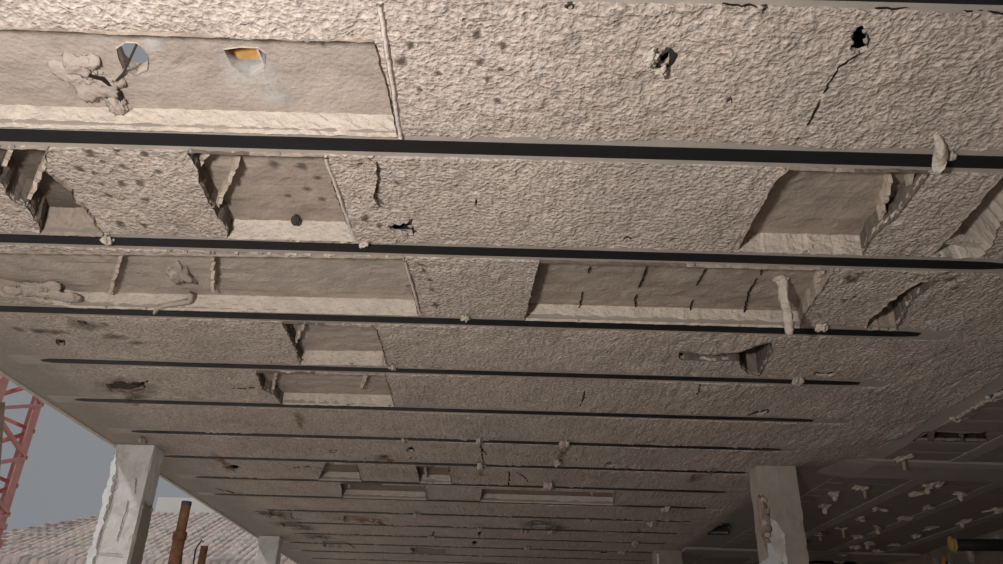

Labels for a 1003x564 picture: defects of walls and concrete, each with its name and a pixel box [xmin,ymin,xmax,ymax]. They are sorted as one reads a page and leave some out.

crack [806,54,859,126]
spalling [0,128,933,228]
spalling [945,155,1003,169]
spalling [0,221,1003,291]
spalling [0,303,921,337]
spalling [41,350,792,384]
spalling [75,398,813,422]
spalling [913,417,987,442]